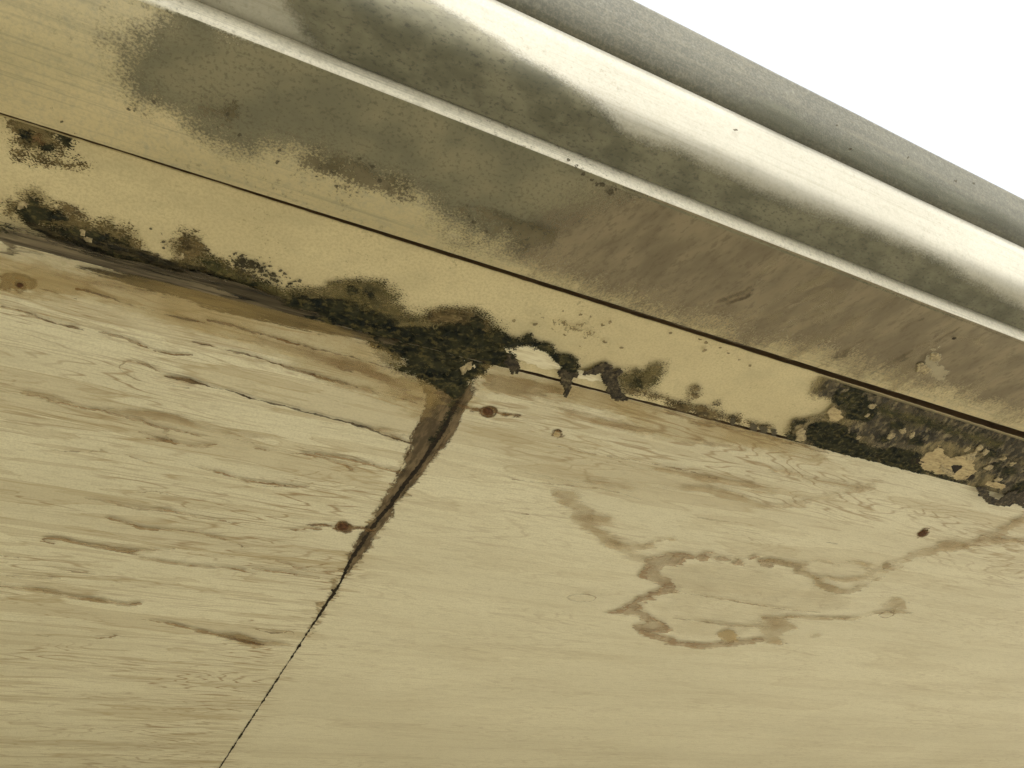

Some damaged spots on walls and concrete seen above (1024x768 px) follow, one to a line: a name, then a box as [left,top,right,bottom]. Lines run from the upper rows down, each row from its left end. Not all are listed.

damp [4,117,91,172]
crack [44,288,117,301]
damp [0,190,518,400]
damp [533,310,624,349]
rust [456,404,520,418]
damp [613,361,1024,508]
peeling [911,445,1016,489]
crack [27,314,476,767]
rust [309,521,376,534]
damp [607,552,801,650]